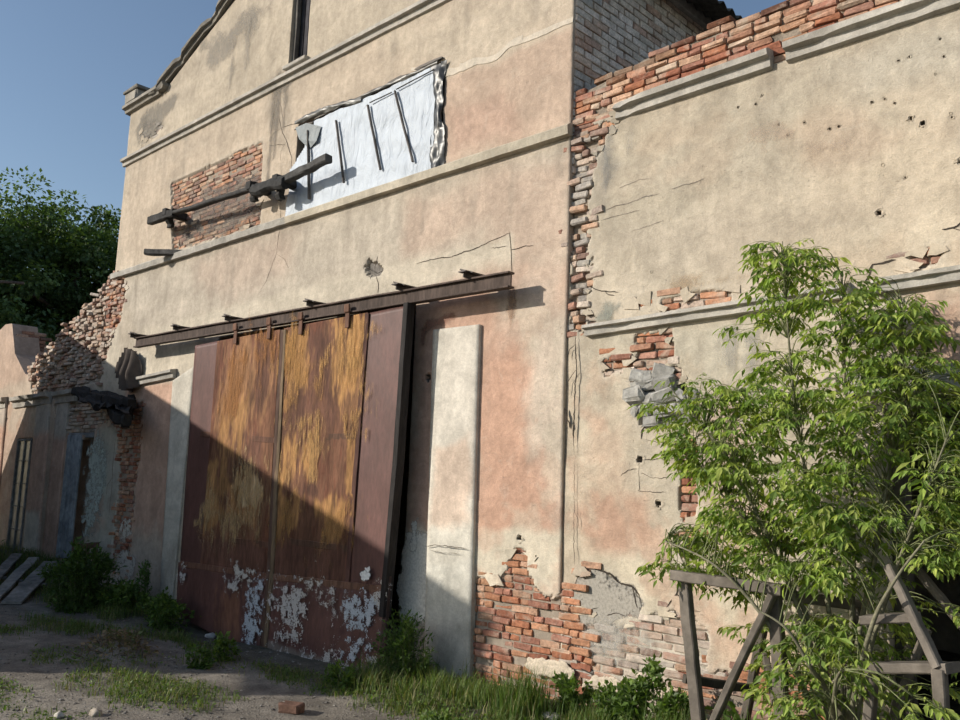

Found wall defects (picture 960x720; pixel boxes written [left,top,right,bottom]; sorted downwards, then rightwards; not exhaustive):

spalling [167,143,264,249]
crack [417,233,534,270]
spalling [558,110,620,338]
crack [601,178,704,232]
spalling [27,271,129,414]
crack [564,337,577,446]
rust [296,415,319,481]
crack [622,427,673,493]
peeling [223,560,392,668]
spalling [473,538,689,720]
crack [565,469,642,675]
spalling [694,610,773,720]